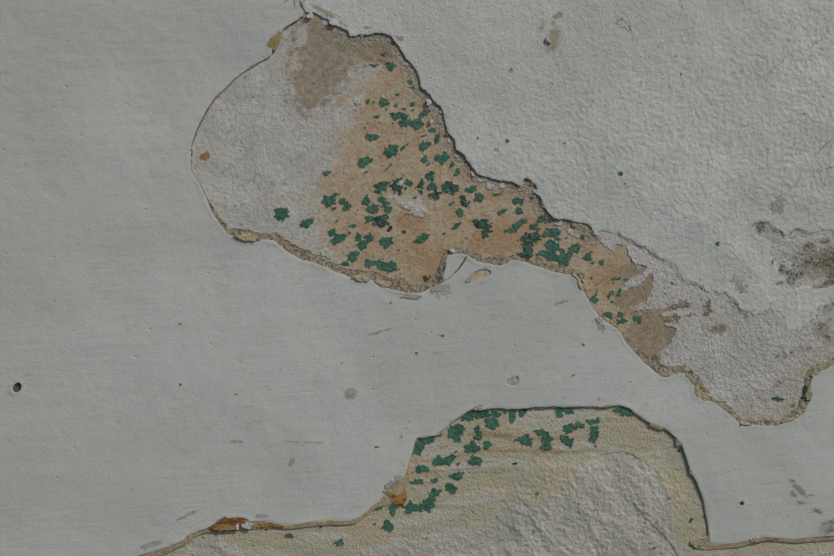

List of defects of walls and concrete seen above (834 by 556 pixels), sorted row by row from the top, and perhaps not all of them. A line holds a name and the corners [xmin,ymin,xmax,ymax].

peeling [190,0,834,426]
peeling [139,404,834,556]